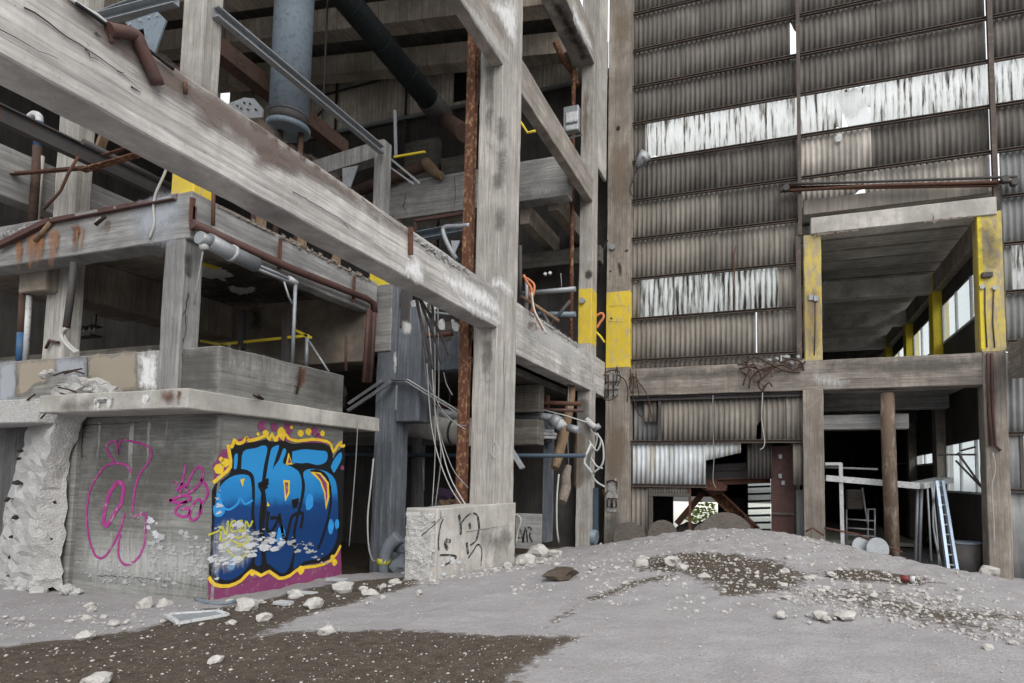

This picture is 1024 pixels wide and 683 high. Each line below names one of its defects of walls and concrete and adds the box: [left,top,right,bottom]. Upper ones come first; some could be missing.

corrosion [16,231,59,258]
spalling [218,205,371,282]
spalling [38,368,121,405]
spalling [0,414,87,596]
peeling [77,467,329,587]